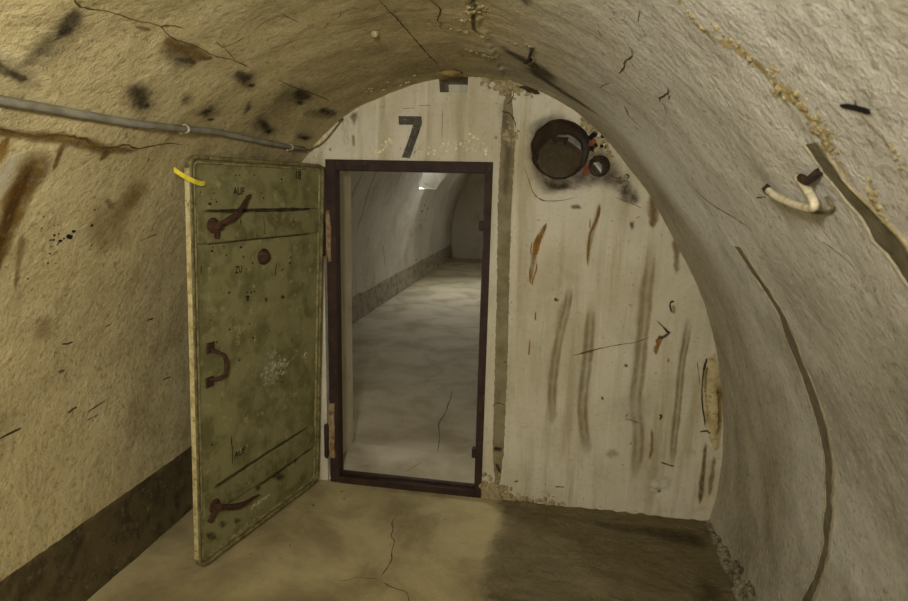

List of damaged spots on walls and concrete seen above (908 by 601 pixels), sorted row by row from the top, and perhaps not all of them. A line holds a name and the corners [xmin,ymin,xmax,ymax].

crack [74,0,304,69]
crack [379,0,443,64]
crack [0,128,181,161]
corrosion [0,144,65,282]
corrosion [529,224,546,284]
corrosion [587,206,600,260]
corrosion [654,321,670,354]
spalling [479,472,565,506]
crack [341,519,409,600]